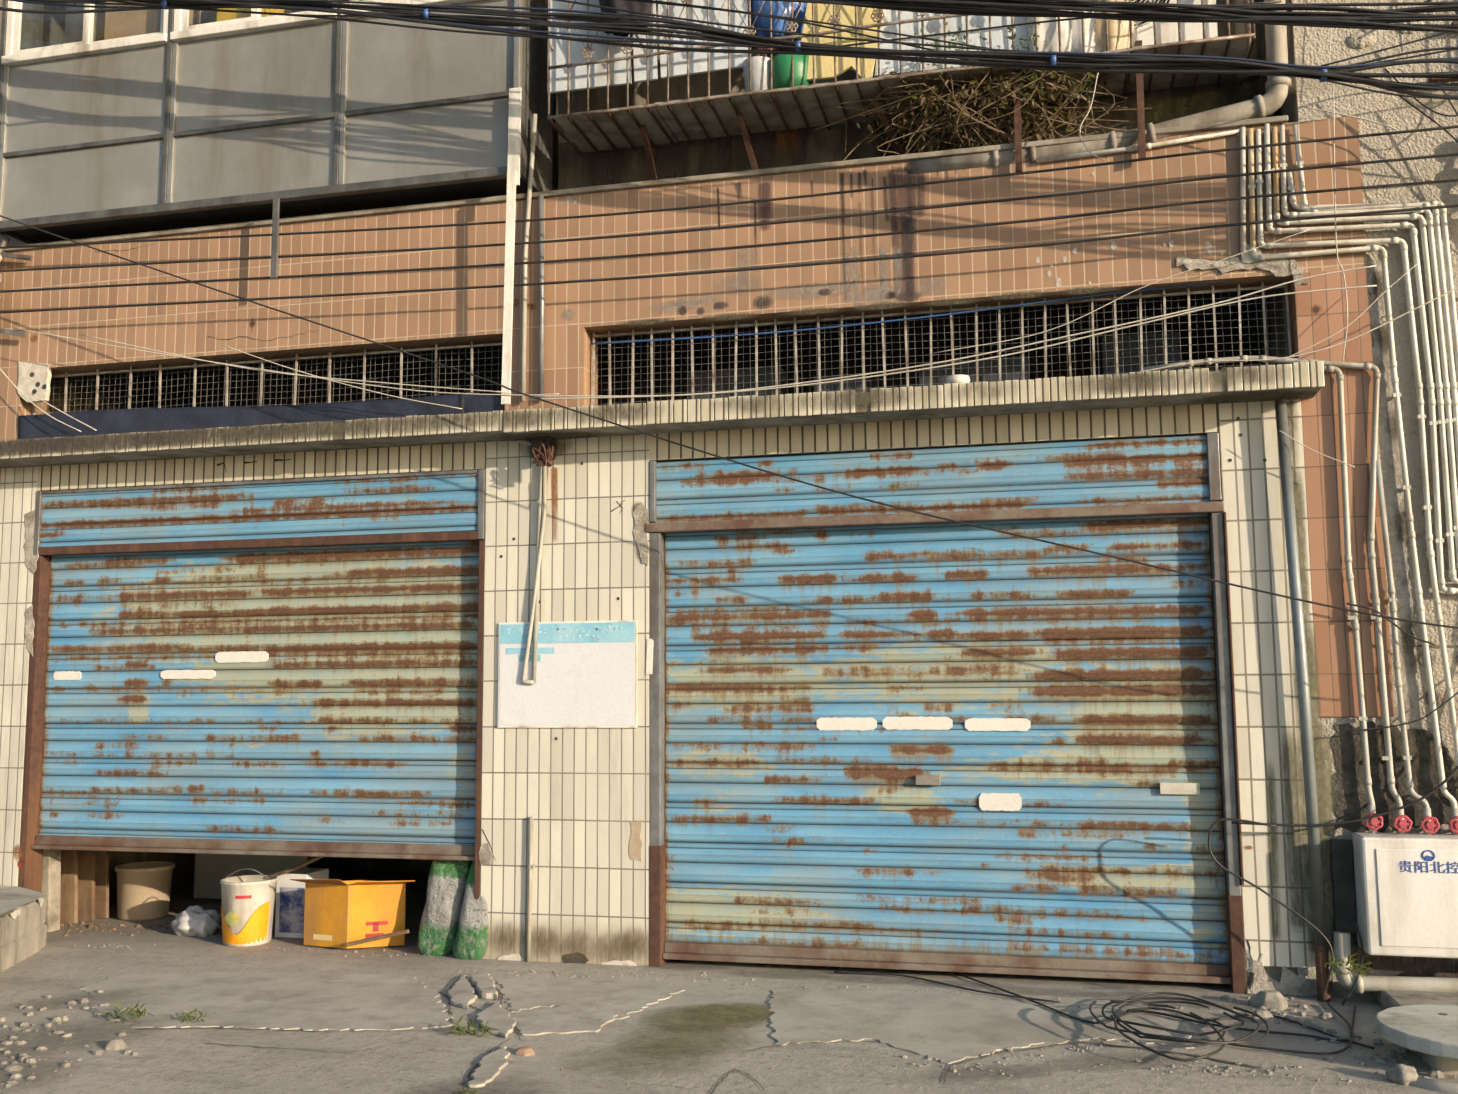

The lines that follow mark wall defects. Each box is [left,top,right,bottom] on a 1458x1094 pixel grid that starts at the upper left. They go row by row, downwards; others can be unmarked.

spalling [1330,263,1458,833]